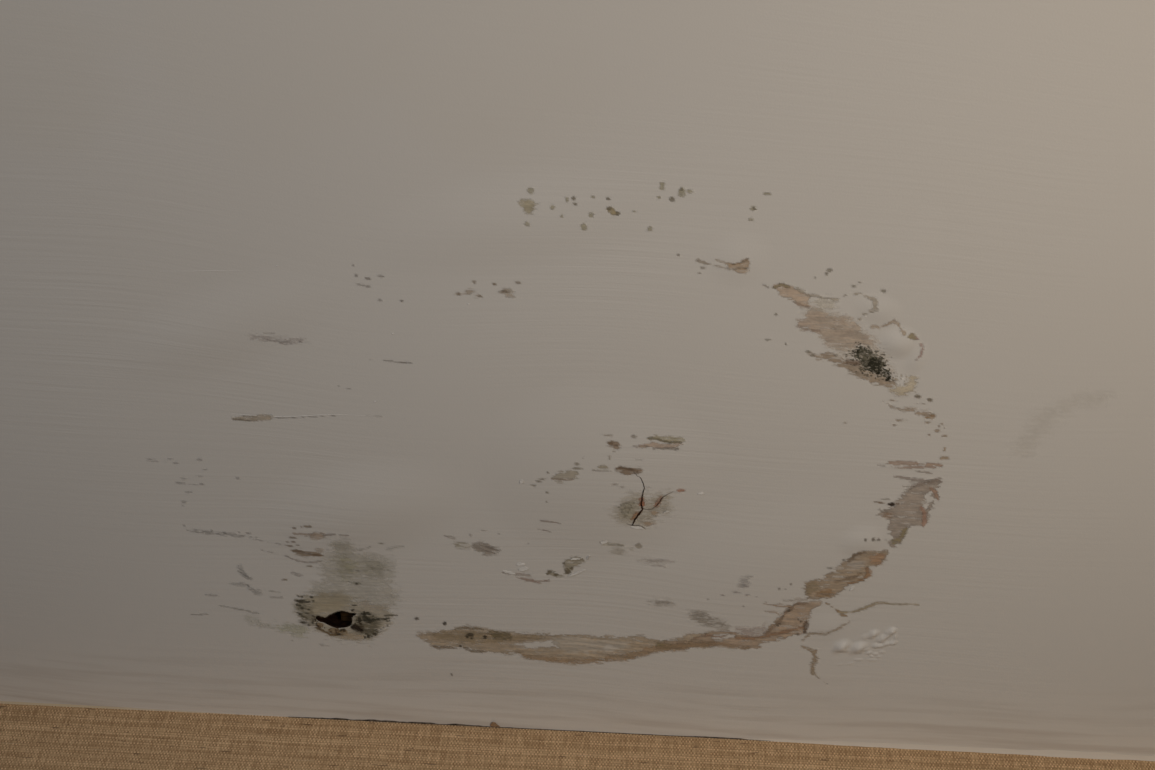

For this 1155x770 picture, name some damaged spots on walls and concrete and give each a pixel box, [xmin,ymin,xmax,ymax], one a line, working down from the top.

crack [628,474,704,530]
damp [418,284,948,675]
peeling [455,542,497,554]
peeling [503,556,590,583]
damp [287,559,397,639]